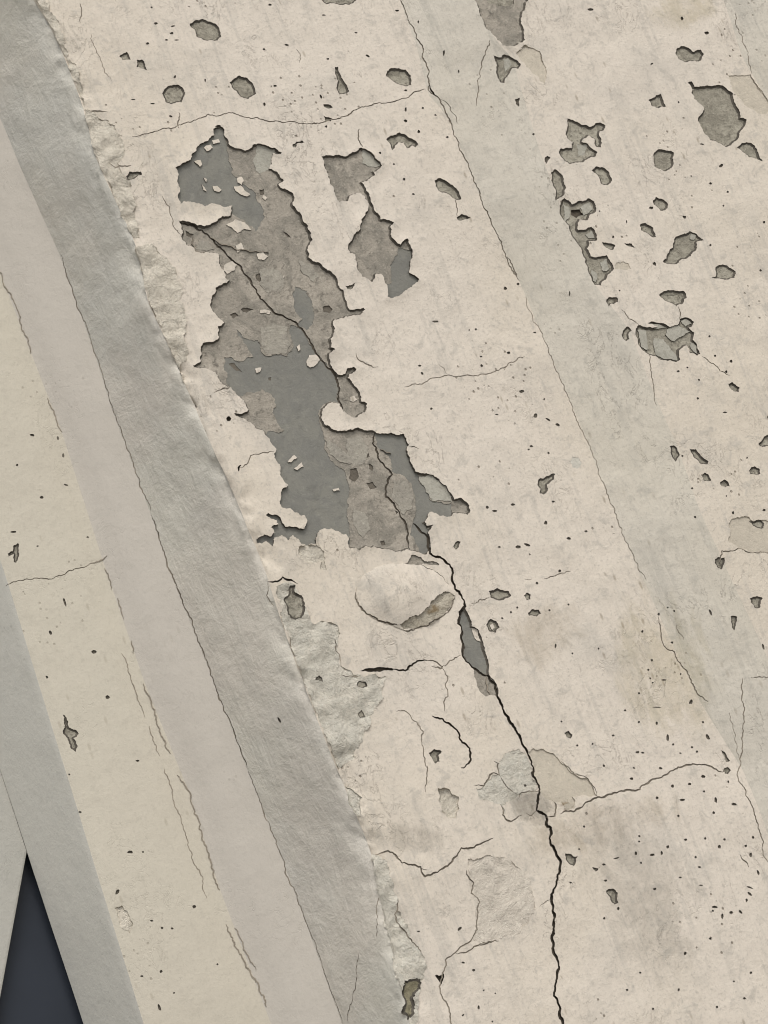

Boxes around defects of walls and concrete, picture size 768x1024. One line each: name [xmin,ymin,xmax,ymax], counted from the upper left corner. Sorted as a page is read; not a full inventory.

peeling [36,0,470,570]
crack [132,0,646,579]
peeling [475,0,547,83]
peeling [545,118,635,285]
peeling [622,317,700,372]
peeling [688,74,768,161]
crack [6,557,220,898]
flaking render [276,582,386,768]
peeling [476,748,596,814]
crack [335,434,768,1024]
flaking render [371,854,444,1024]